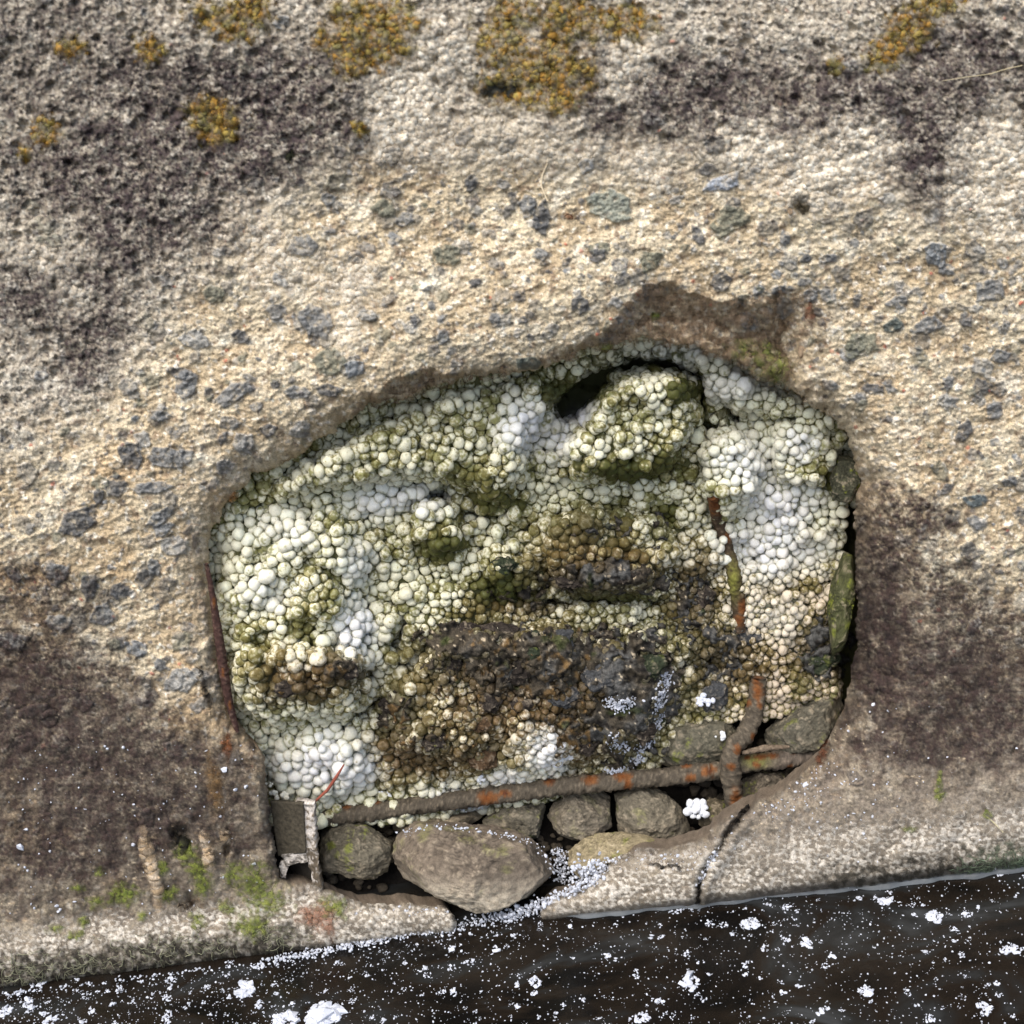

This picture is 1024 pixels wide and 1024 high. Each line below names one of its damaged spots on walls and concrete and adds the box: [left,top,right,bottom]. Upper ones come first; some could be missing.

water stain [0,557,260,888]
corrosion [204,563,239,752]
crack [649,804,750,905]
water stain [850,482,1024,773]